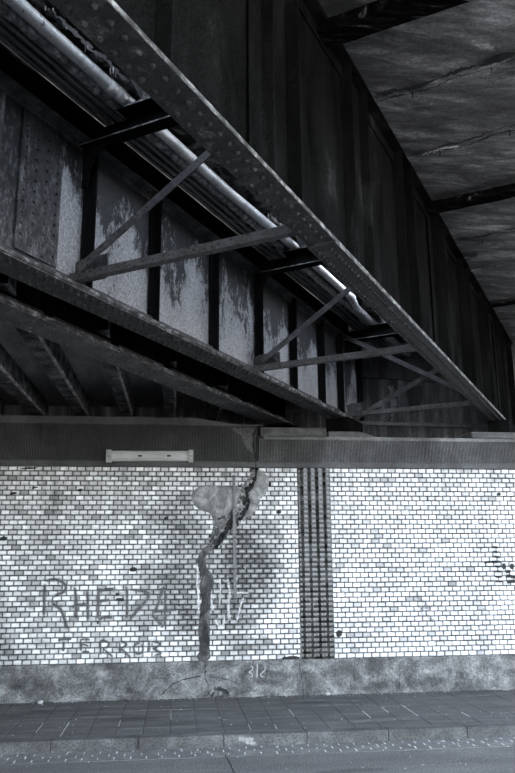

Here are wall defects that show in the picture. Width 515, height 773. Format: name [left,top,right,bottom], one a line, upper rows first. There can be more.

crack [375,52,515,101]
crack [410,124,515,160]
crack [199,467,269,550]
crack [157,664,237,695]